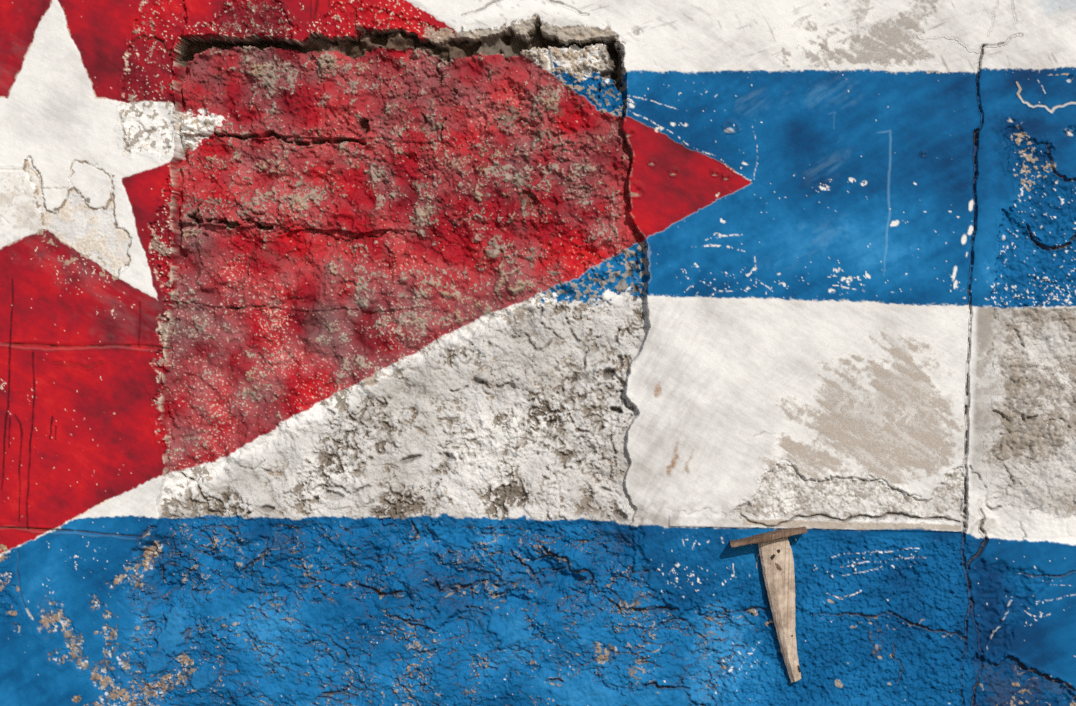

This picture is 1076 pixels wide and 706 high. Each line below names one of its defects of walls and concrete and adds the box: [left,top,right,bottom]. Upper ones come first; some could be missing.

spalling [118,0,627,159]
spalling [730,333,964,523]
crack [810,0,1076,706]
spalling [979,122,1076,517]
spalling [0,518,776,706]